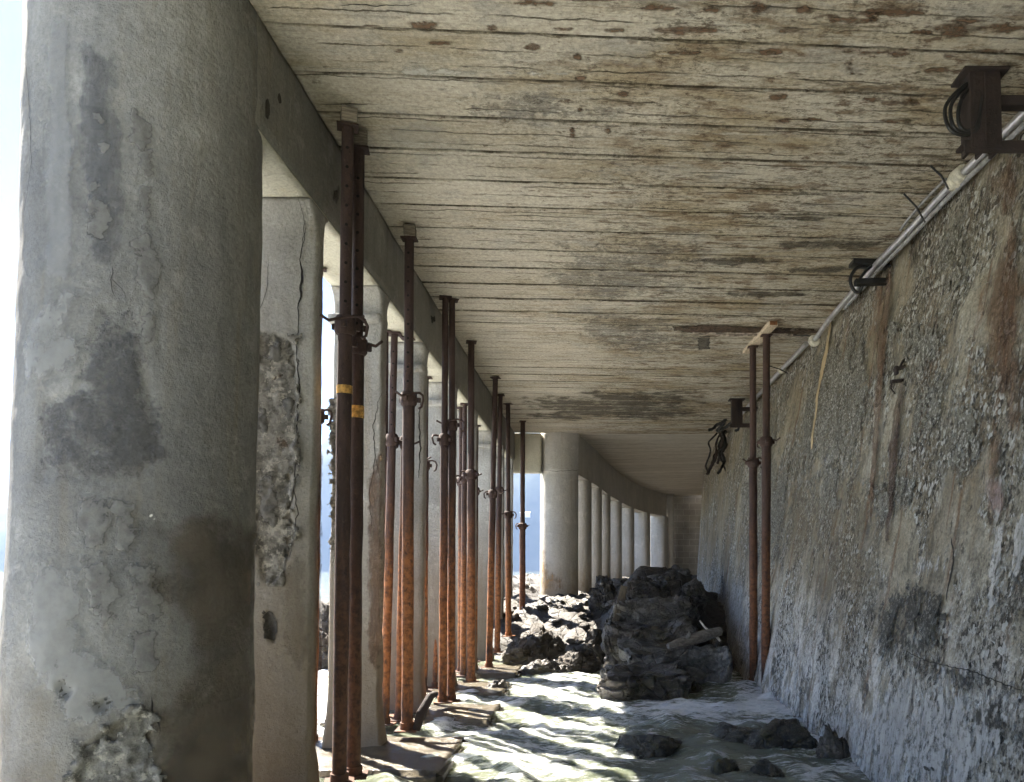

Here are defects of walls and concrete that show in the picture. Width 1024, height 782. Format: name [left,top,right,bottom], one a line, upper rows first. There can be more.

damp [80,52,123,256]
peeling [27,496,167,782]
spalling [262,610,277,641]
spalling [255,333,302,587]
crack [290,464,299,554]
crack [296,195,306,433]
damp [718,556,1024,782]
rust [869,263,902,542]